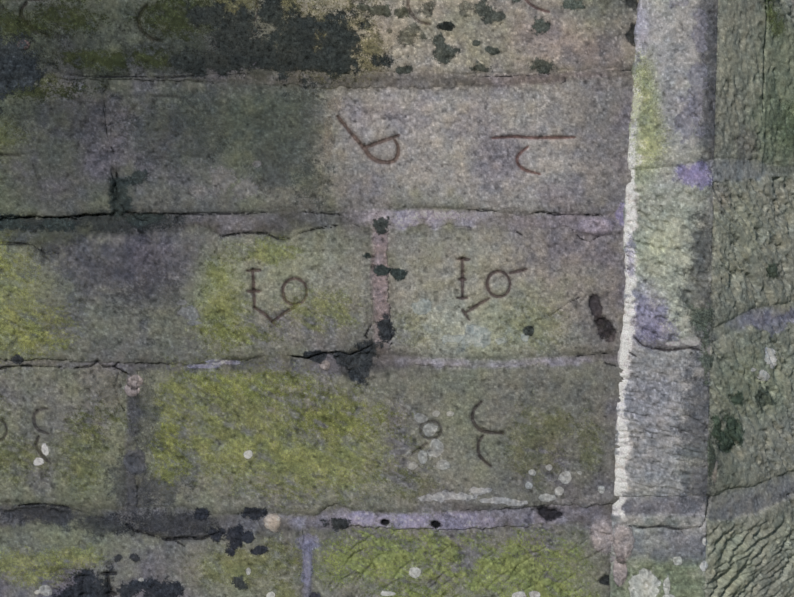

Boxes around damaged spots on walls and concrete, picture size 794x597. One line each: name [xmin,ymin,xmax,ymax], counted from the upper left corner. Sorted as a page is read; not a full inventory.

water stain [2,0,258,101]
spalling [589,294,616,342]
water stain [4,503,216,536]